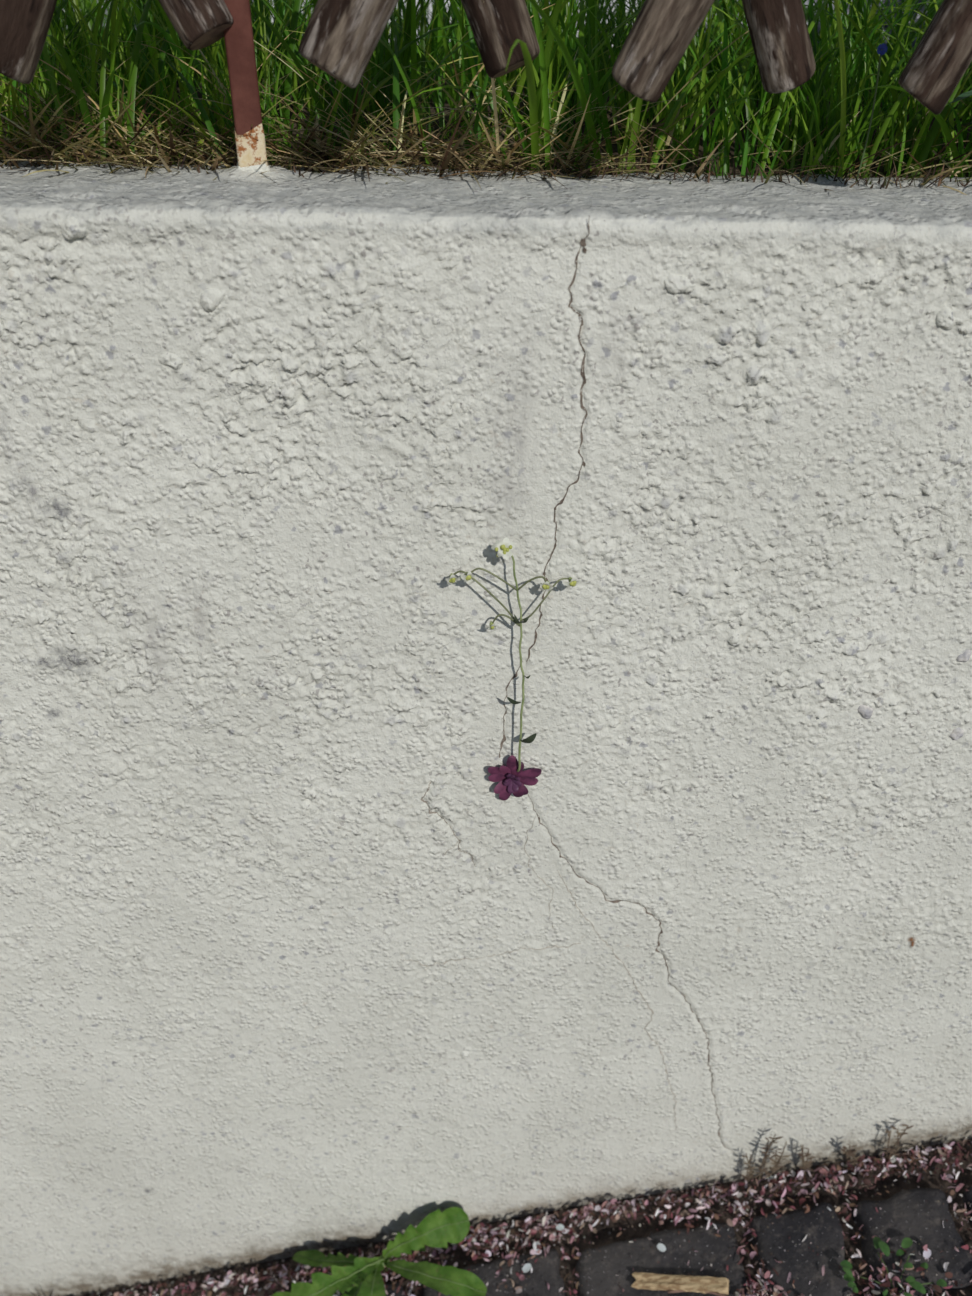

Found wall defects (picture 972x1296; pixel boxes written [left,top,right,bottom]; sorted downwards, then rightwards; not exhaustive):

crack [499,215,590,758]
crack [401,782,732,1151]